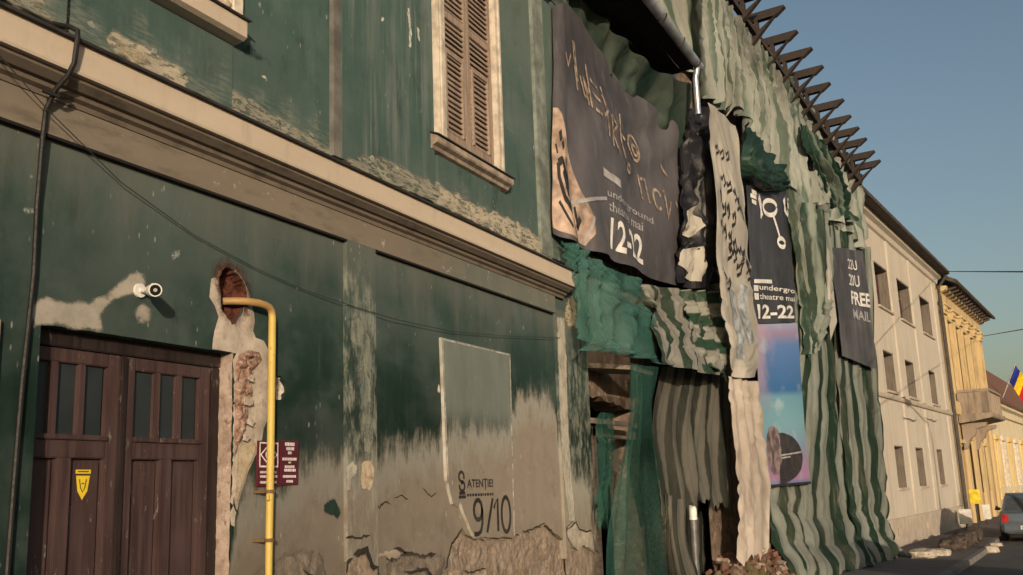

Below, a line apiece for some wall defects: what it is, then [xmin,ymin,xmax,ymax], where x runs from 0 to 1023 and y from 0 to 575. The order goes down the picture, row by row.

peeling [9,0,53,21]
peeling [106,32,188,87]
peeling [232,90,330,155]
peeling [347,155,552,259]
flaking render [209,267,284,575]
peeling [346,317,374,491]
flaking render [442,294,596,575]
flaking render [345,553,378,575]